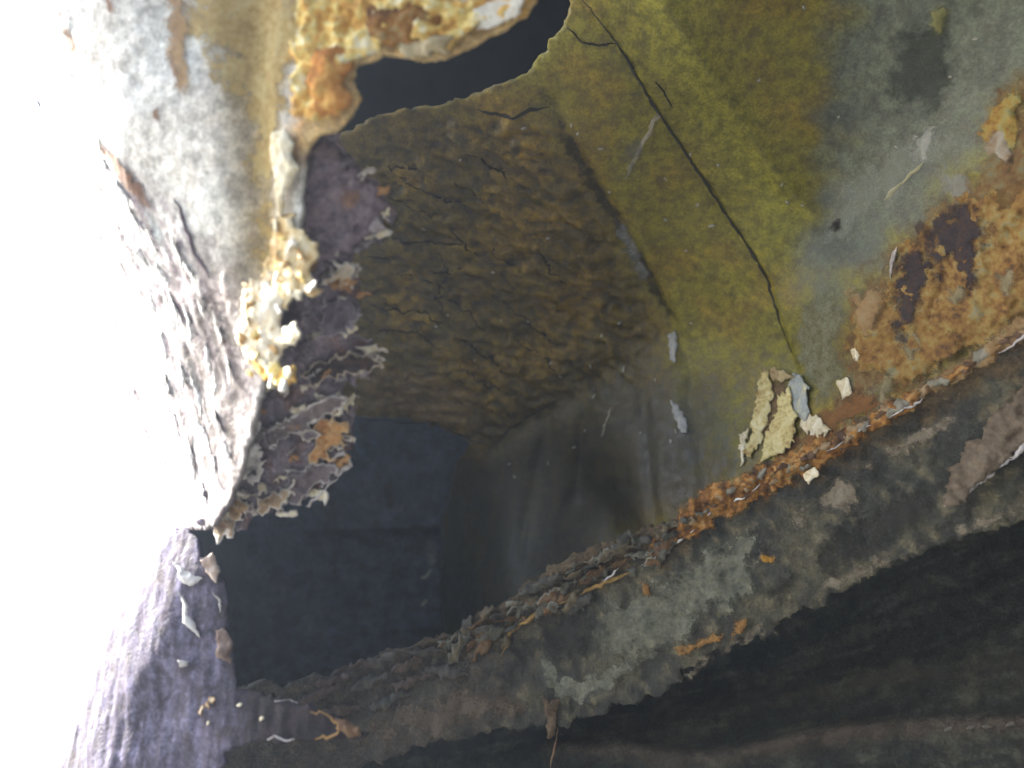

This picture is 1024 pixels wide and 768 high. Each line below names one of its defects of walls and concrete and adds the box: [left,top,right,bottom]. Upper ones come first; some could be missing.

corrosion [166,0,532,262]
crack [477,106,671,315]
crack [567,0,792,353]
leakage [824,126,969,243]
peeling [96,129,393,638]
peeling [738,366,832,466]
corrosion [642,77,1024,567]
peeling [942,386,1024,508]
peeling [214,627,233,663]
corrosion [334,717,361,738]